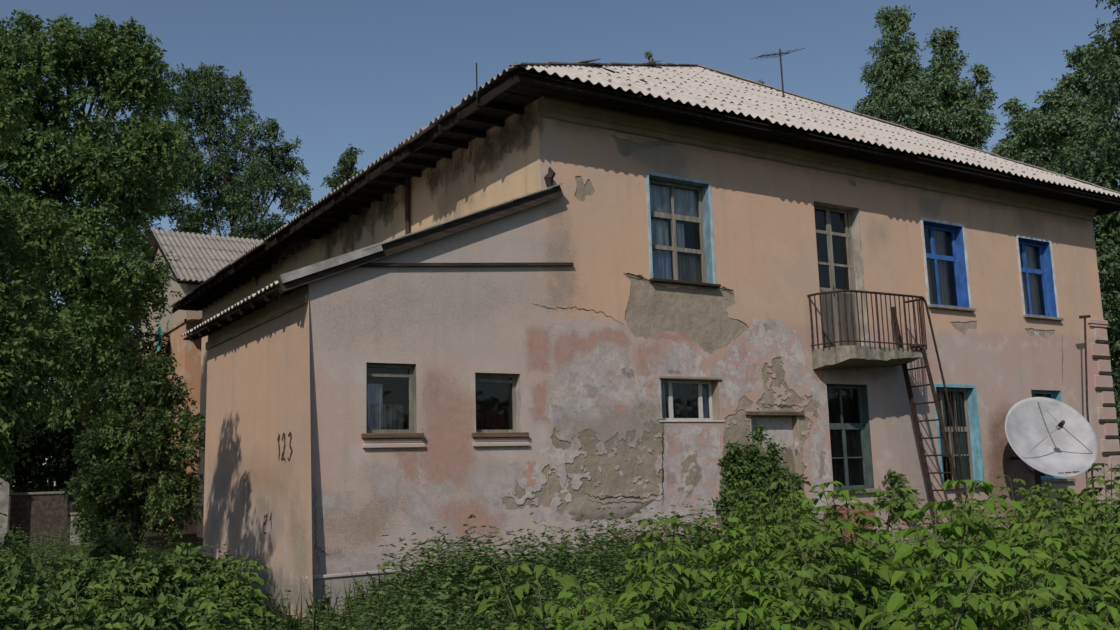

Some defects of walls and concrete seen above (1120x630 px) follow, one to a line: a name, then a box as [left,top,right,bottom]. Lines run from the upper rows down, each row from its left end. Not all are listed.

flaking render [574,176,595,202]
leakage [245,100,1090,288]
flaking render [485,272,876,547]